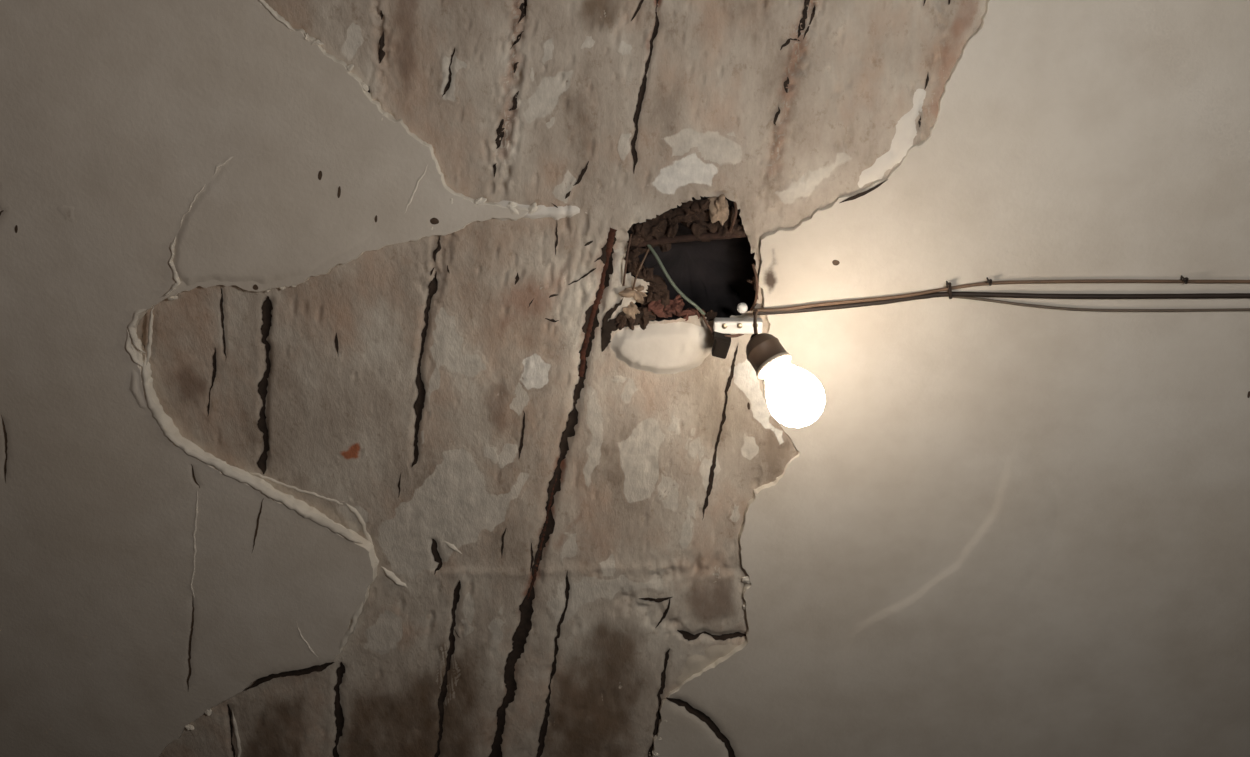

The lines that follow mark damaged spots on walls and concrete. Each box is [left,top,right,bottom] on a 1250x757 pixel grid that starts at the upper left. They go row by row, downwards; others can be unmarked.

crack [631,0,659,172]
crack [773,0,816,125]
crack [252,296,273,551]
rust [333,440,363,465]
crack [398,235,449,497]
crack [488,161,616,757]
rust [485,223,629,363]
spalling [125,0,991,757]
crack [702,346,738,520]
crack [228,662,345,757]
crack [431,539,461,757]
crack [639,597,746,757]